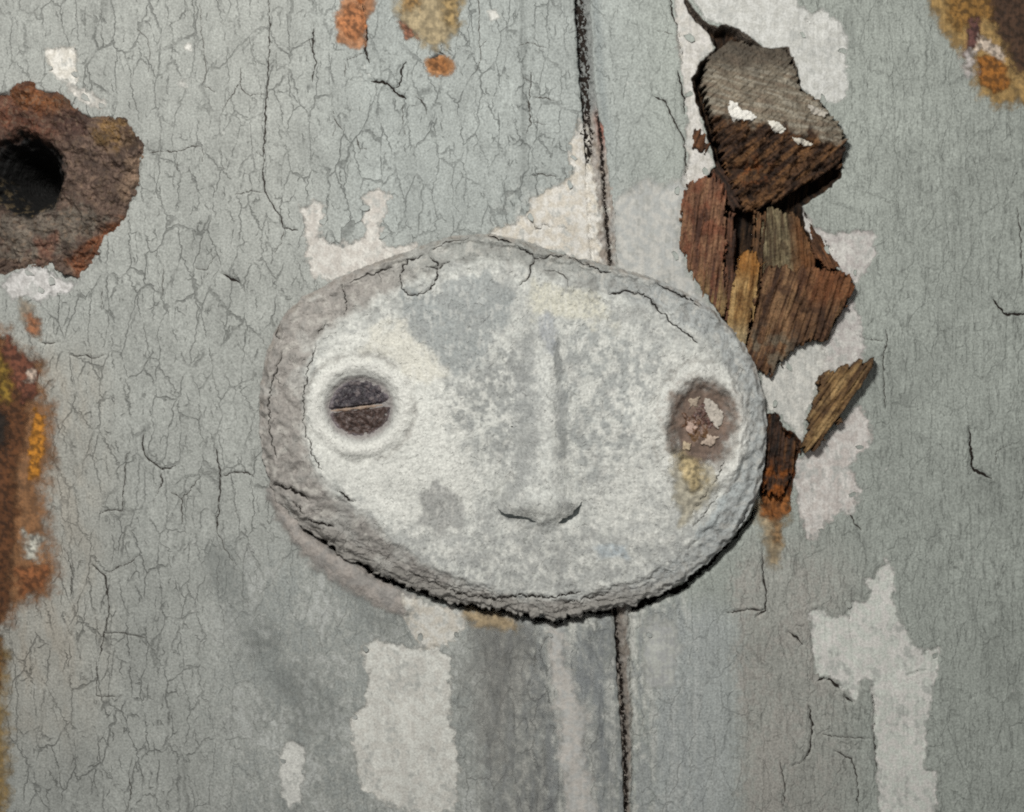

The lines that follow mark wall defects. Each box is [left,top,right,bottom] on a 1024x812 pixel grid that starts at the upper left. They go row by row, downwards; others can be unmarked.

rust [0,334,56,623]
rust [0,81,144,279]
crack [99,430,336,563]
crack [199,0,298,252]
crack [267,0,698,468]
peeling [490,0,849,323]
rust [669,382,737,525]
peeling [723,159,877,547]
rust [930,0,1024,105]
peeling [349,593,467,812]
crack [357,509,755,812]
peeling [807,555,940,812]